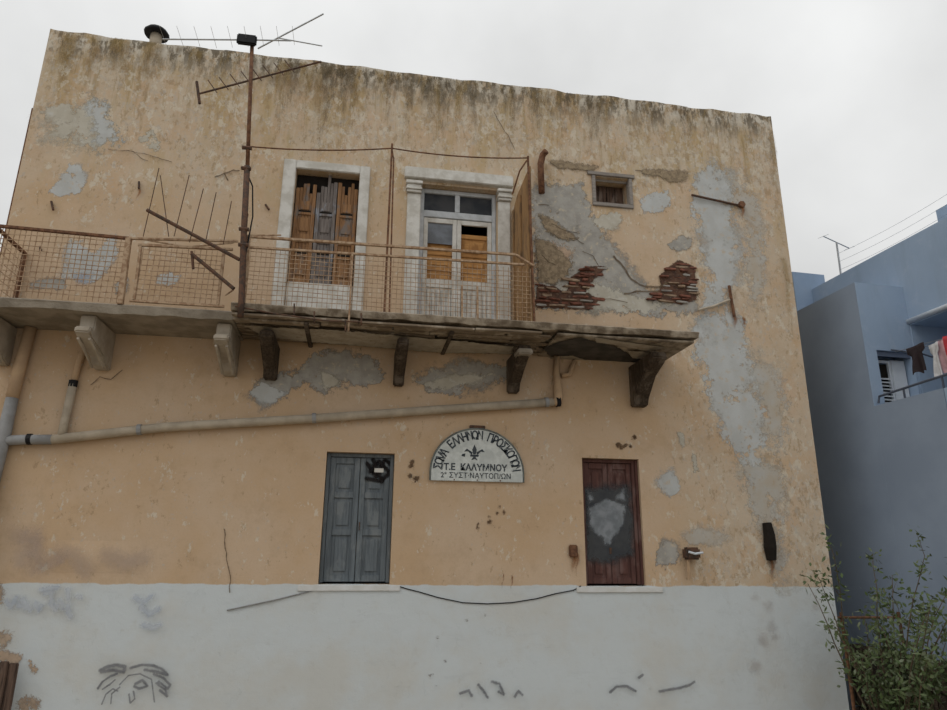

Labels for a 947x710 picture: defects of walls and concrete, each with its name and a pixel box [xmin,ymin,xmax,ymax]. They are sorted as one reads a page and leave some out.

peeling [40,96,125,155]
peeling [49,164,88,197]
peeling [30,238,118,290]
flaking render [243,325,514,408]
peeling [531,159,792,587]